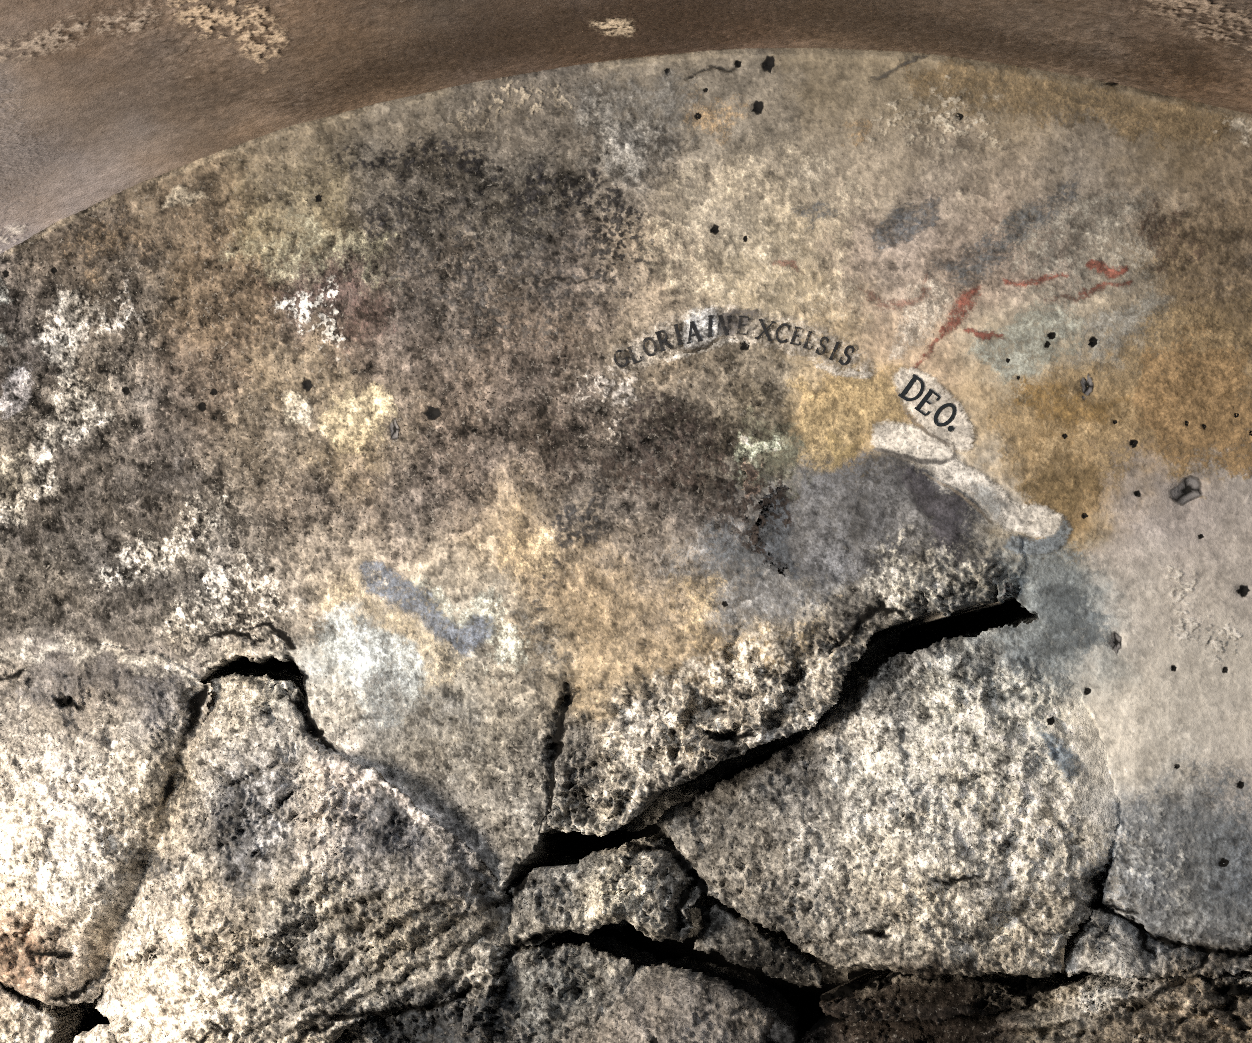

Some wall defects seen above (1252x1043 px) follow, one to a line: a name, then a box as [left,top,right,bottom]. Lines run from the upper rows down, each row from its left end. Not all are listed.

water stain [272,133,664,373]
crack [830,597,1034,663]
spalling [1236,585,1249,597]
crack [163,621,338,806]
peeling [609,618,842,795]
peeling [230,765,291,871]
peeling [310,745,438,840]
crack [295,685,903,1043]
peeling [1095,800,1193,910]
crack [0,950,110,1035]
crack [963,971,1093,1010]
crack [1088,872,1252,1029]